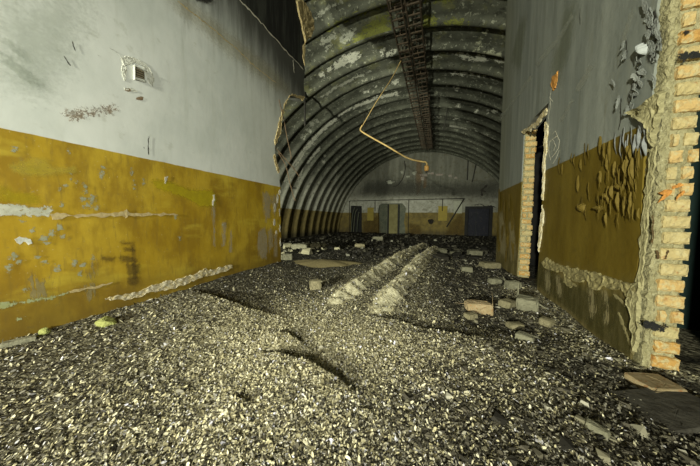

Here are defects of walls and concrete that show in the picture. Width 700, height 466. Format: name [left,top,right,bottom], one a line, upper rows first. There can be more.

spalling [296,0,344,66]
peeling [318,4,393,77]
peeling [0,173,177,245]
peeling [521,0,685,352]
spalling [106,265,232,301]